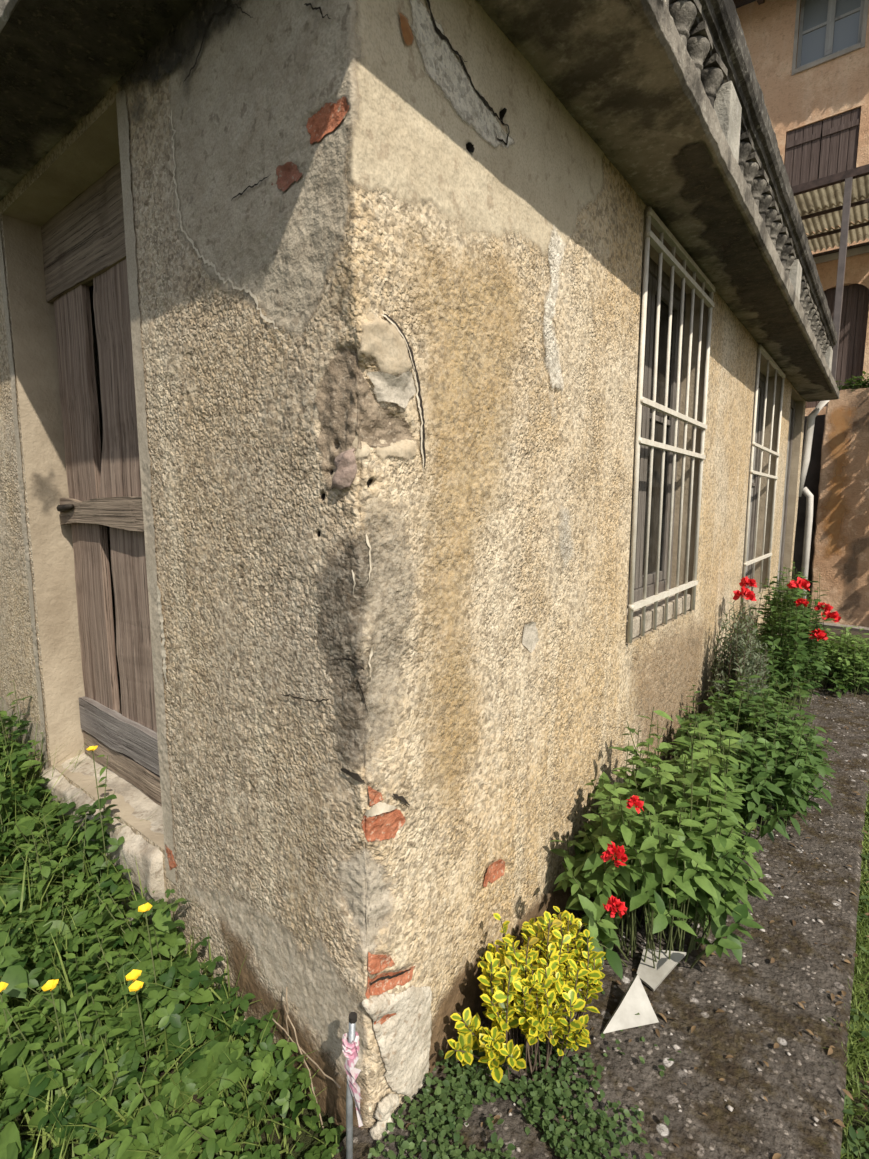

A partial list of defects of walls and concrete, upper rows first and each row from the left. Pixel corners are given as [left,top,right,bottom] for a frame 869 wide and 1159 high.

leakage [0,0,243,170]
flaking render [169,0,604,334]
crack [410,0,514,147]
spalling [314,317,417,500]
leakage [315,530,378,769]
leakage [841,538,869,618]
spalling [338,786,432,1141]
flaking render [483,859,505,887]